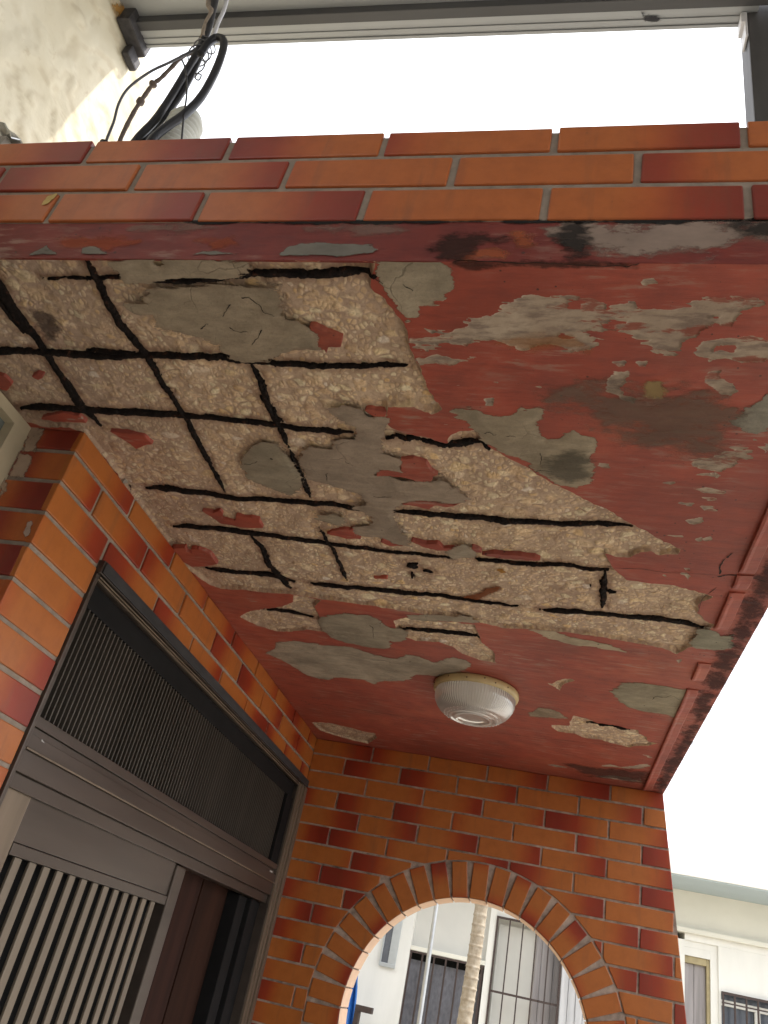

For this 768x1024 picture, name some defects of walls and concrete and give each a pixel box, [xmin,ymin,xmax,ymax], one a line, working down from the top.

damp [256,218,768,271]
crack [201,297,268,344]
spalling [0,220,768,663]
damp [544,380,748,460]
crack [622,553,755,608]
damp [567,565,768,791]
spalling [552,716,657,782]